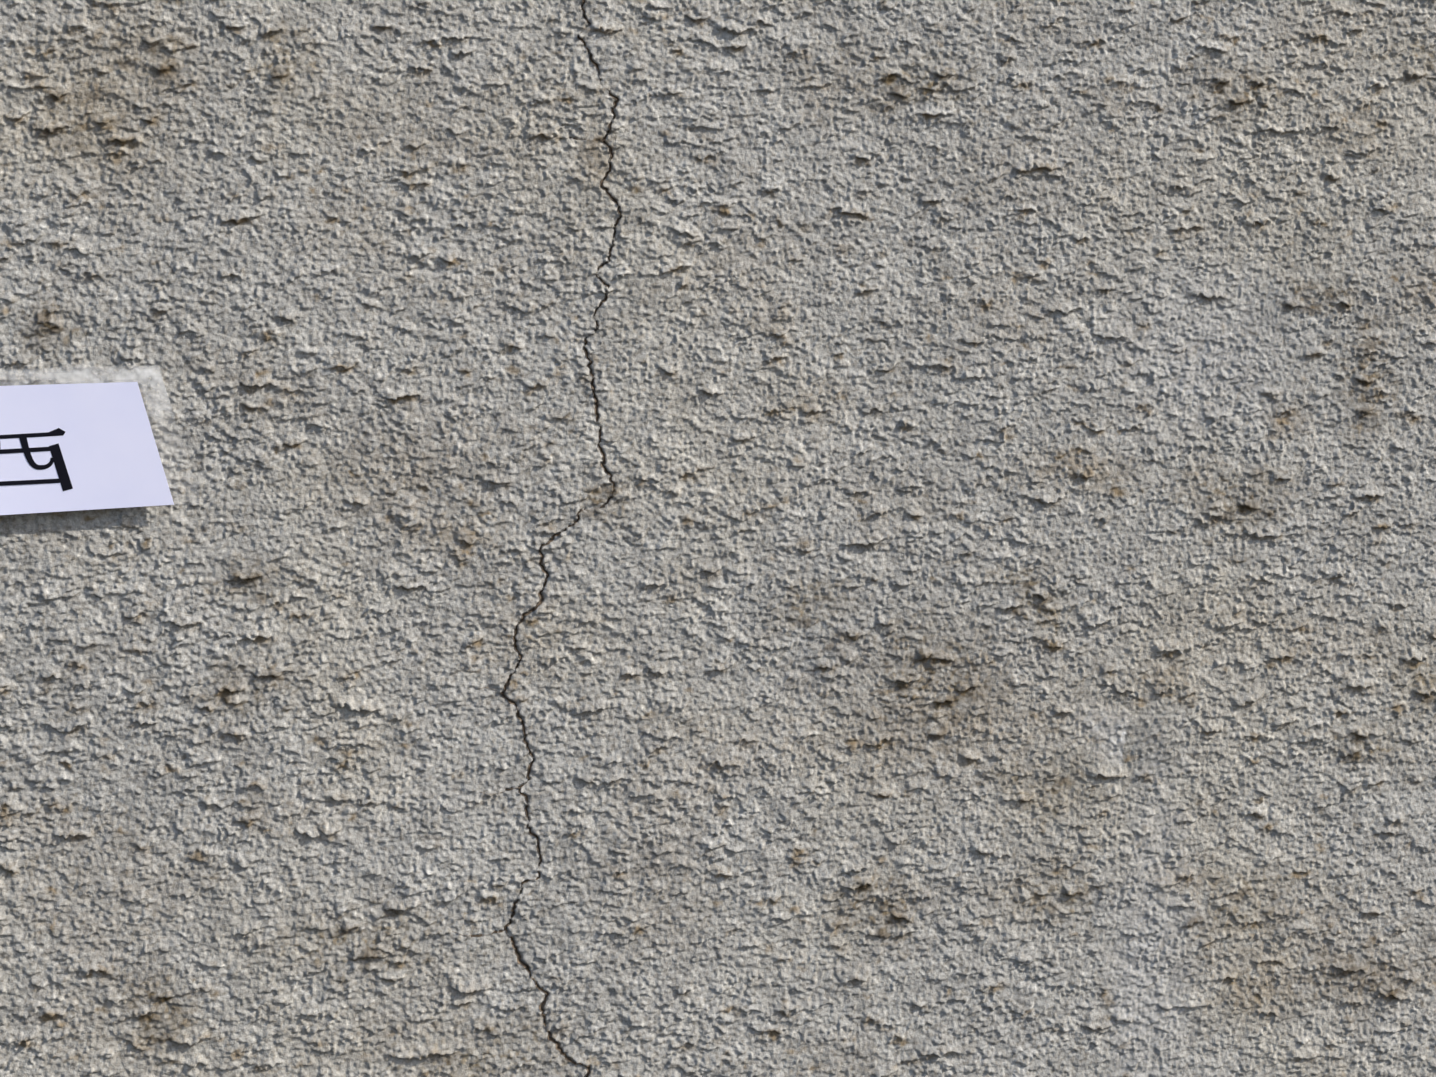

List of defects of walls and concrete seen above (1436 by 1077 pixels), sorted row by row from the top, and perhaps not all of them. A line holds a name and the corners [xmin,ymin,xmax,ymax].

crack [452,0,622,1077]